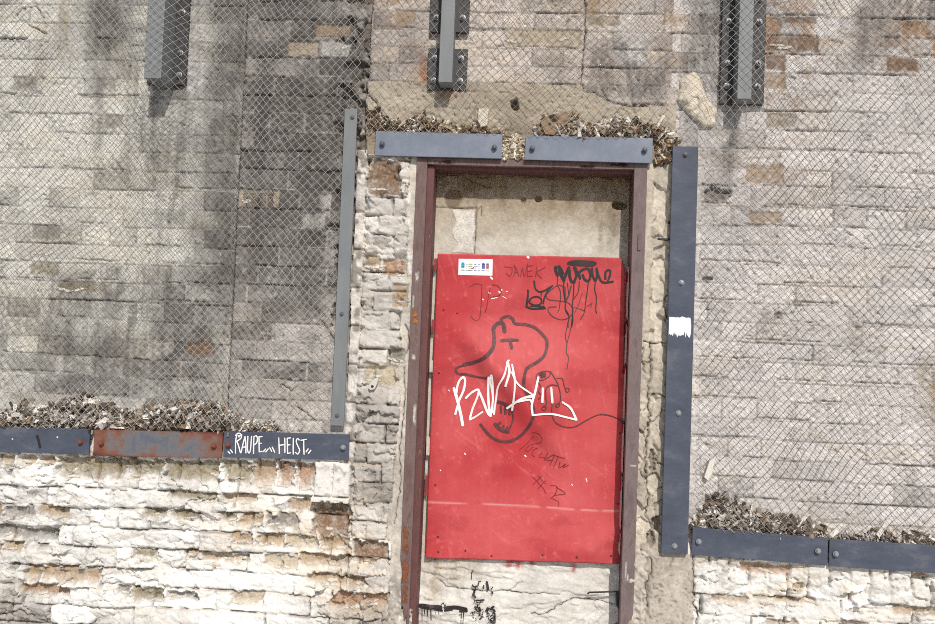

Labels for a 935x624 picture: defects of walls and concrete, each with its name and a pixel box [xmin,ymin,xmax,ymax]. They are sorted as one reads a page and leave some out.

spalling [356,160,419,307]
peeling [346,402,354,422]
crack [644,341,665,525]
spalling [0,454,388,611]
spalling [741,562,788,577]
spalling [775,583,820,606]
spalling [893,604,935,617]